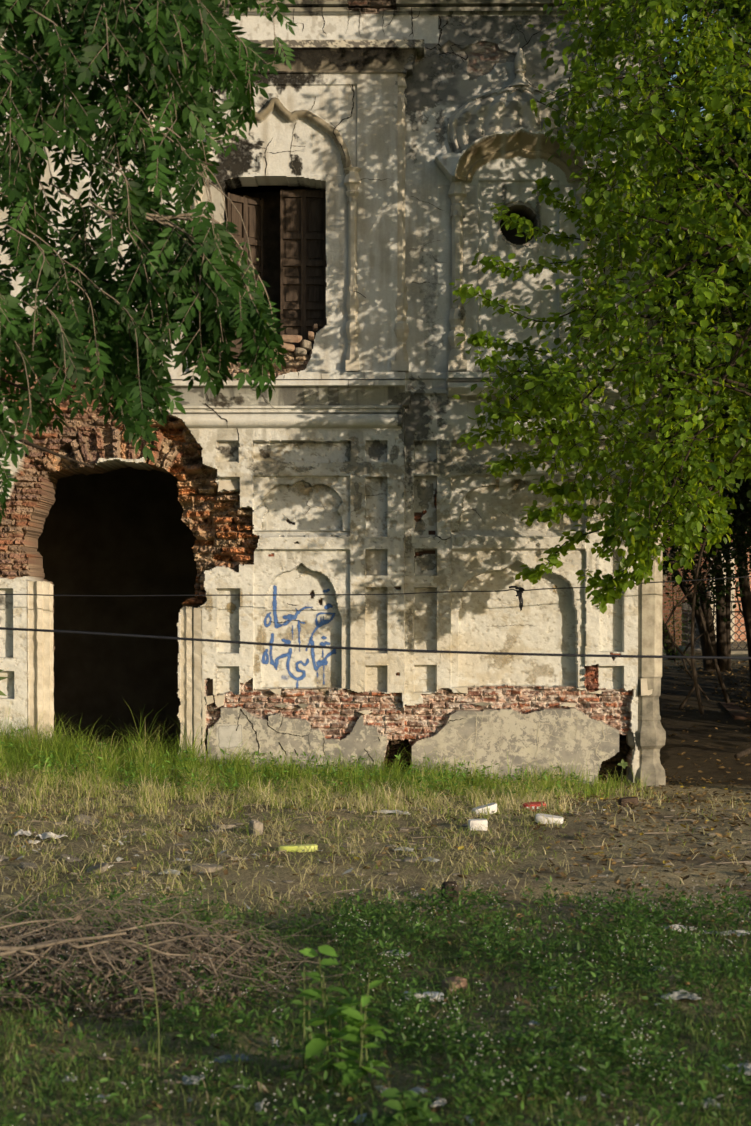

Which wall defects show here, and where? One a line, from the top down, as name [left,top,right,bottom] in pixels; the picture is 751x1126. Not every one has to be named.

damp [301,0,323,16]
spalling [440,41,516,81]
crack [251,84,441,210]
peeling [218,480,238,492]
spalling [205,664,653,775]